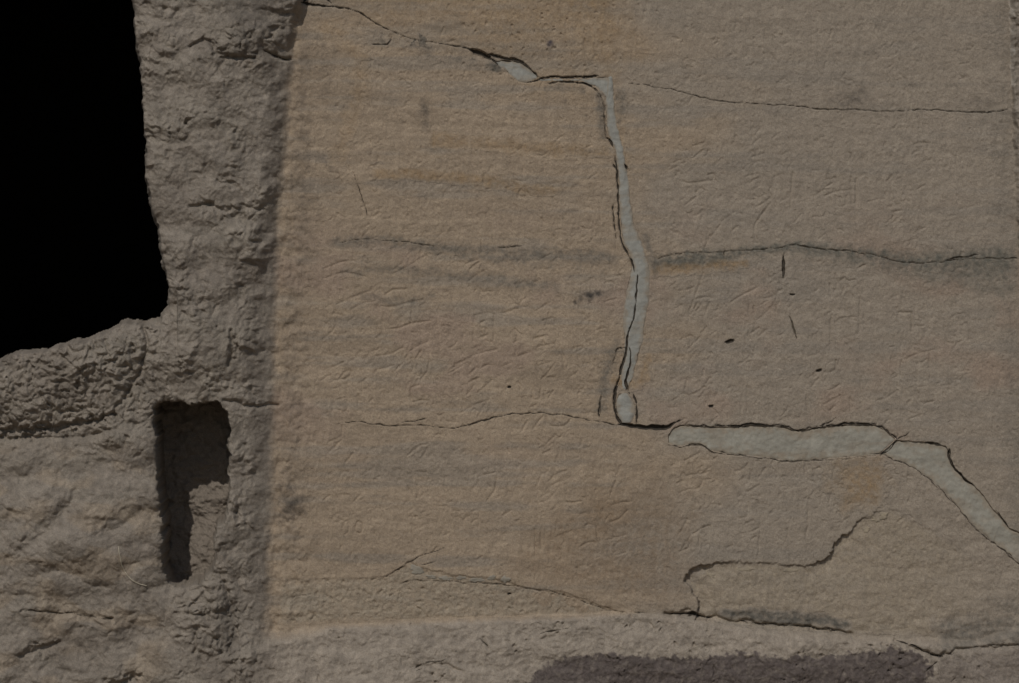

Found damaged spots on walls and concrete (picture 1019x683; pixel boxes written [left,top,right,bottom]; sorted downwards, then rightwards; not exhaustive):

crack [301,0,1019,564]